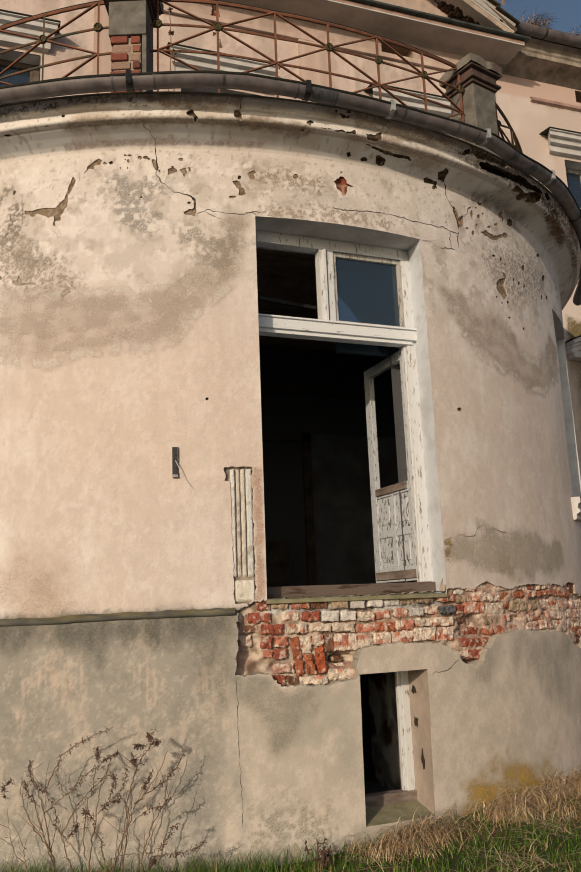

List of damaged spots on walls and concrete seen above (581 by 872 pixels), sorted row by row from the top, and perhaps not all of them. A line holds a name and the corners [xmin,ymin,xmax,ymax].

spalling [0,177,76,299]
peeling [84,154,191,236]
crack [143,125,260,219]
spalling [229,170,323,198]
spalling [334,172,353,196]
crack [335,183,471,250]
spalling [445,200,513,240]
damp [0,217,243,368]
spalling [489,252,547,304]
damp [450,528,562,577]
flaking render [235,579,581,687]